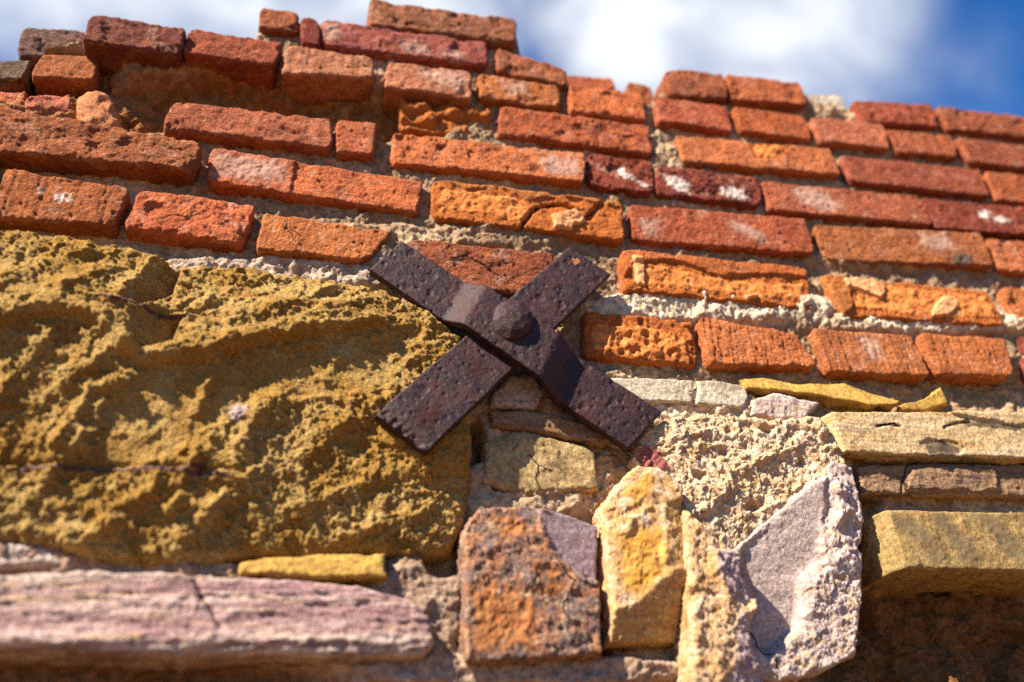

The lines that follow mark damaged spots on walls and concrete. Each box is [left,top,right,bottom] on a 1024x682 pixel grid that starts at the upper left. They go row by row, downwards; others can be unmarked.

leakage [662,174,690,195]
leakage [720,186,750,200]
crack [90,293,201,321]
crack [2,462,240,476]